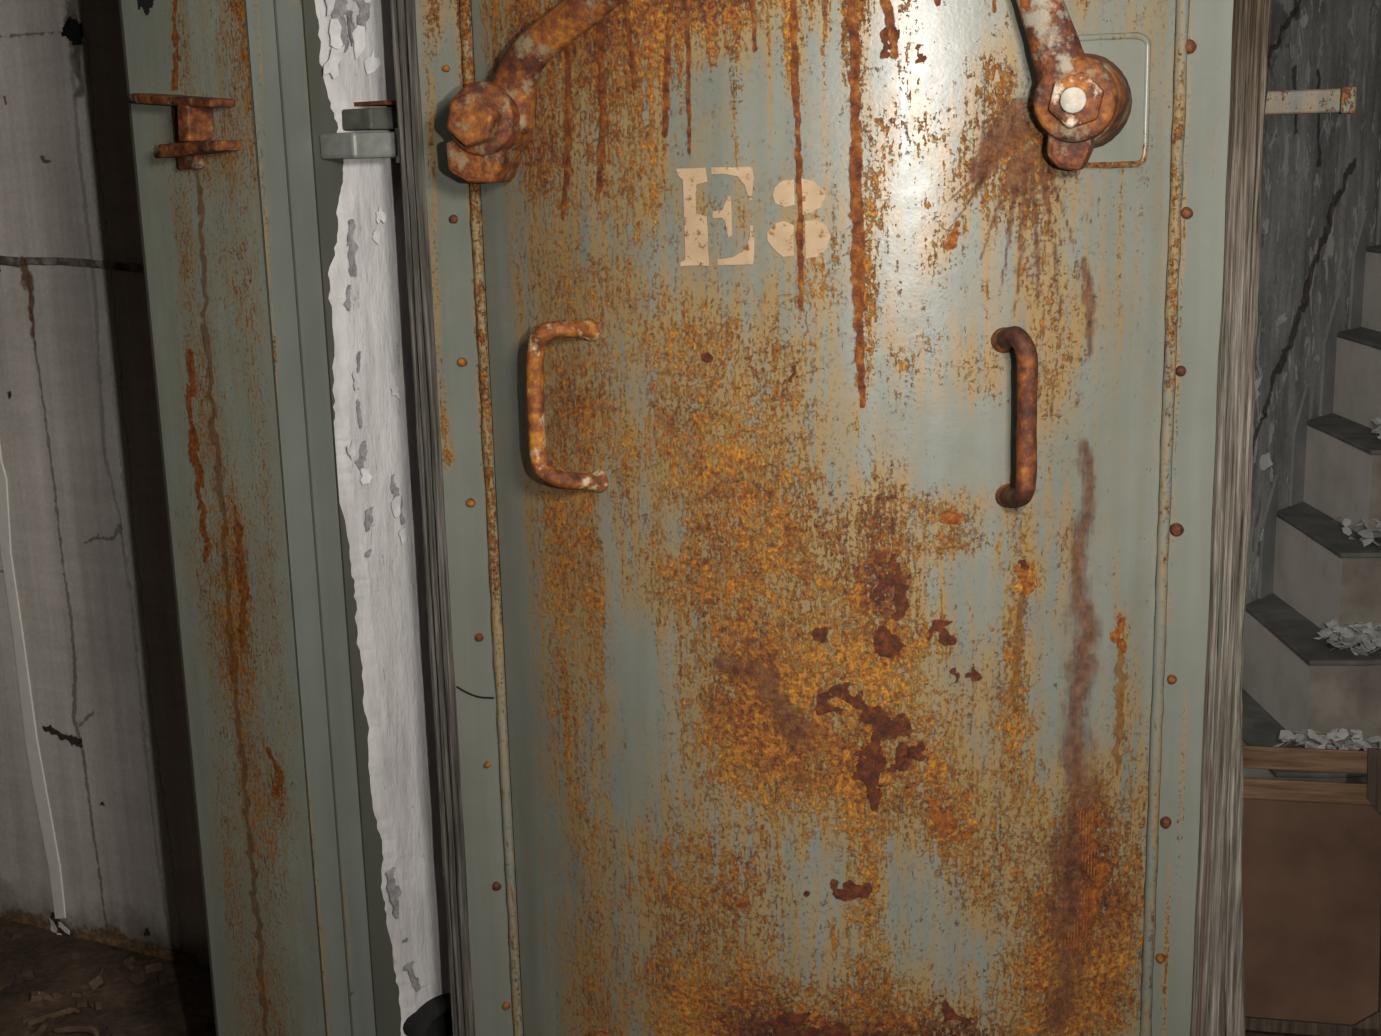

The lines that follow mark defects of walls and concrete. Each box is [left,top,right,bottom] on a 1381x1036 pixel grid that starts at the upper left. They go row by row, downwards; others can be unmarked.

peeling [315,0,396,133]
rust [661,0,691,154]
rust [880,0,900,59]
rust [915,44,927,64]
rust [789,0,805,311]
rust [846,0,866,408]
rust [186,348,212,563]
peeling [328,158,450,1036]
rust [869,549,910,659]
crack [43,725,83,747]
rust [815,682,928,811]
rust [830,879,872,901]